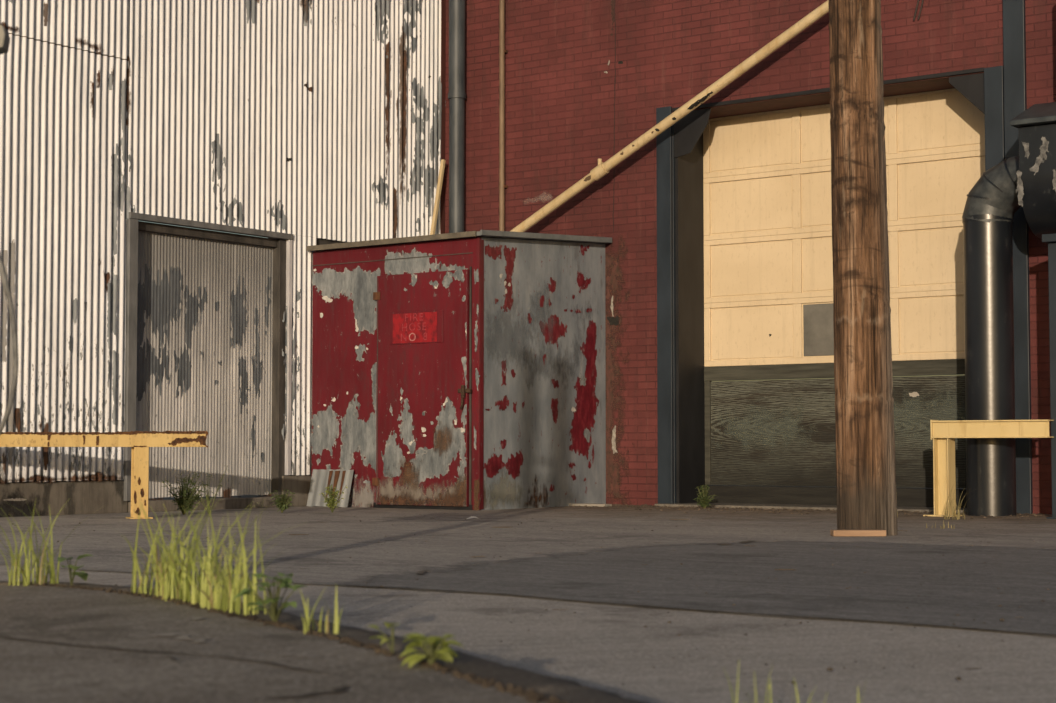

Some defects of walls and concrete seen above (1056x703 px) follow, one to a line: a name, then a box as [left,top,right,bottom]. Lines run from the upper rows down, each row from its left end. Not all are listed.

peeling [301,0,312,27]
peeling [373,0,390,58]
rust [76,39,130,125]
peeling [401,0,446,232]
peeling [372,175,389,210]
peeling [1016,137,1056,207]
peeling [136,264,271,465]
peeling [282,244,525,510]
spalling [528,237,629,504]
rust [0,408,208,484]
rust [134,476,163,515]
crack [0,636,474,699]